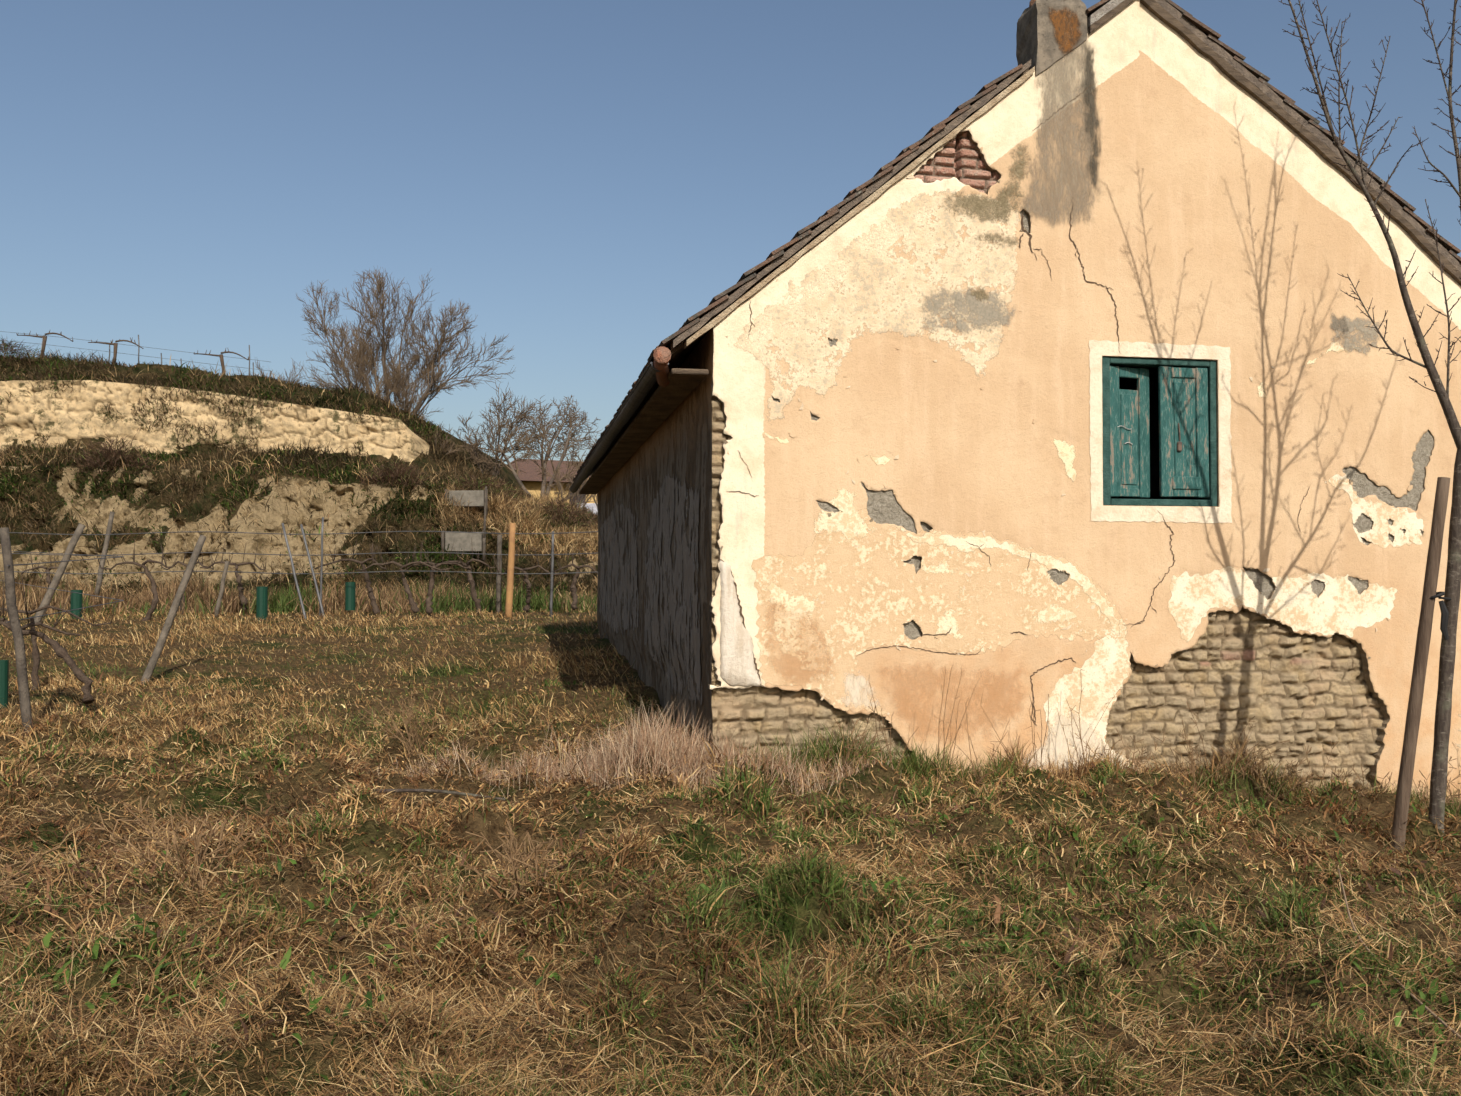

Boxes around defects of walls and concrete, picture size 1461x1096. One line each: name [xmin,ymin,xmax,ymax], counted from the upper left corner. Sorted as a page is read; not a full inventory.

damp [942,41,1101,246]
peeling [726,132,1029,444]
damp [923,288,1014,332]
crack [1019,198,1120,352]
peeling [1325,431,1434,548]
peeling [599,396,1398,796]